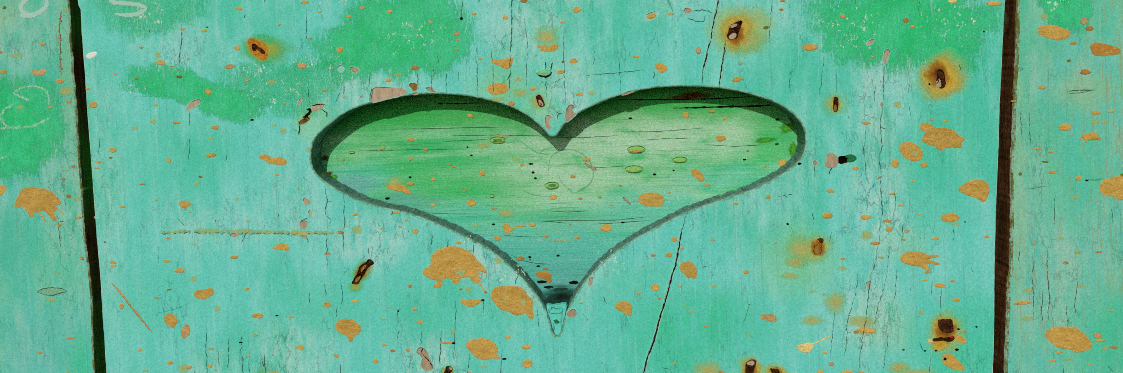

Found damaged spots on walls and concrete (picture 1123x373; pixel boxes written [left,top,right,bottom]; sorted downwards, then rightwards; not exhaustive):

rust [715,12,768,52]
rust [247,38,283,60]
rust [921,57,964,98]
rust [827,97,843,112]
rust [790,238,829,261]
rust [350,259,374,291]
crack [641,216,706,373]
rust [927,314,960,351]
rust [741,358,786,373]